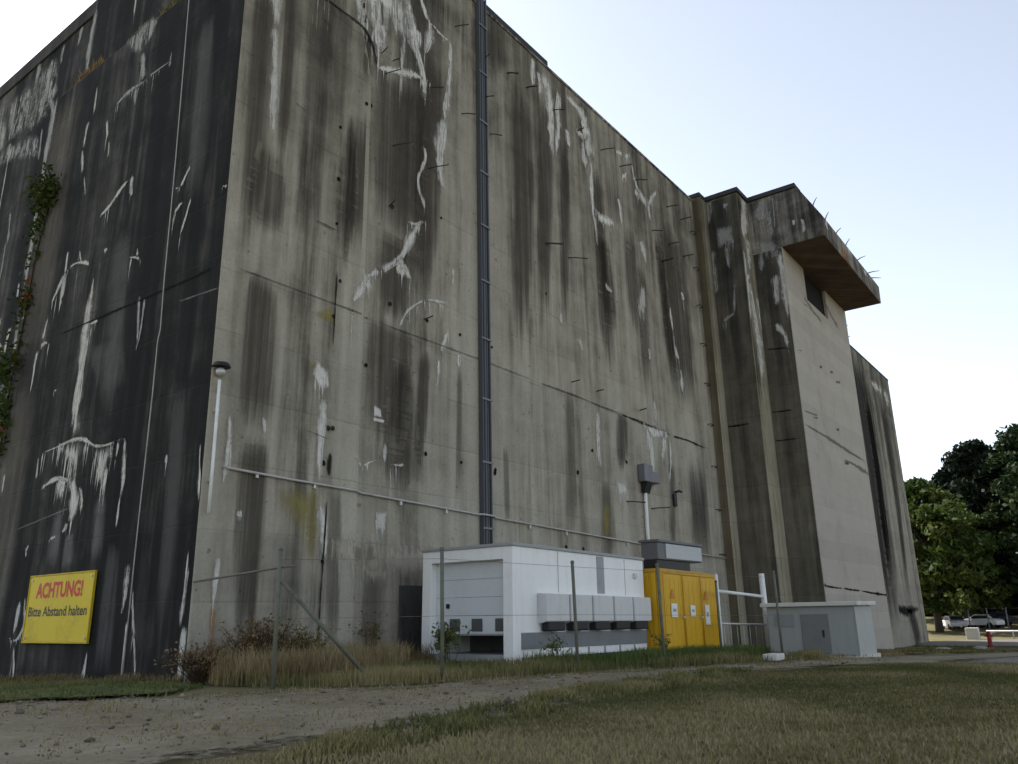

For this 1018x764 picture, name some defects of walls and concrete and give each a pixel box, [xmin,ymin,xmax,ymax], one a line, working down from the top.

water stain [115,19,172,111]
water stain [245,0,294,219]
water stain [356,0,452,313]
water stain [513,59,622,351]
efflorescence [30,253,89,390]
water stain [36,281,126,541]
water stain [121,568,135,673]
water stain [178,556,189,677]
water stain [237,447,265,631]
efflorescence [313,364,328,475]
water stain [626,233,693,390]
water stain [853,365,907,612]